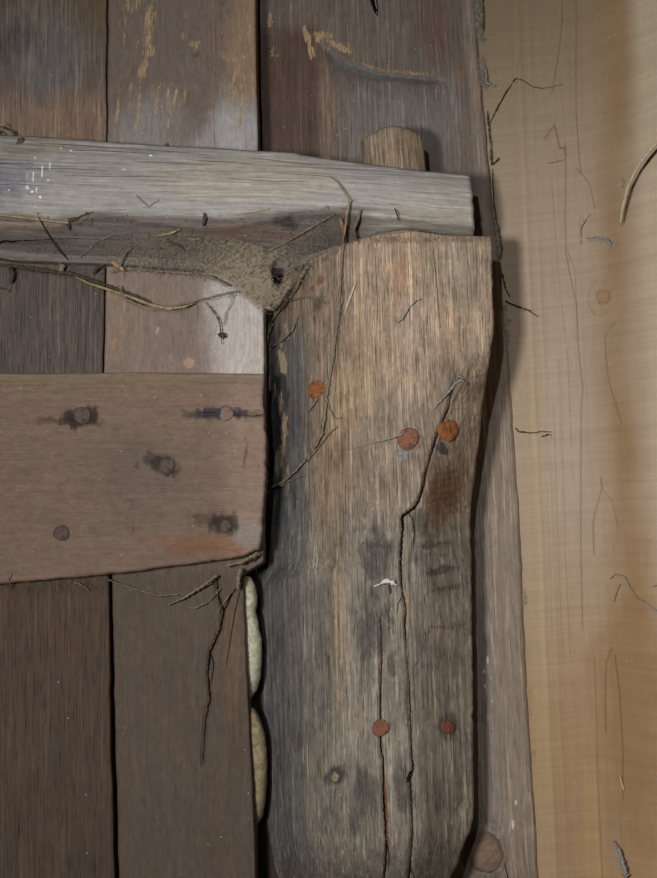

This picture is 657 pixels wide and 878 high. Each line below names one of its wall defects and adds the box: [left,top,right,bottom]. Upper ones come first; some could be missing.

crack [379,357,456,878]